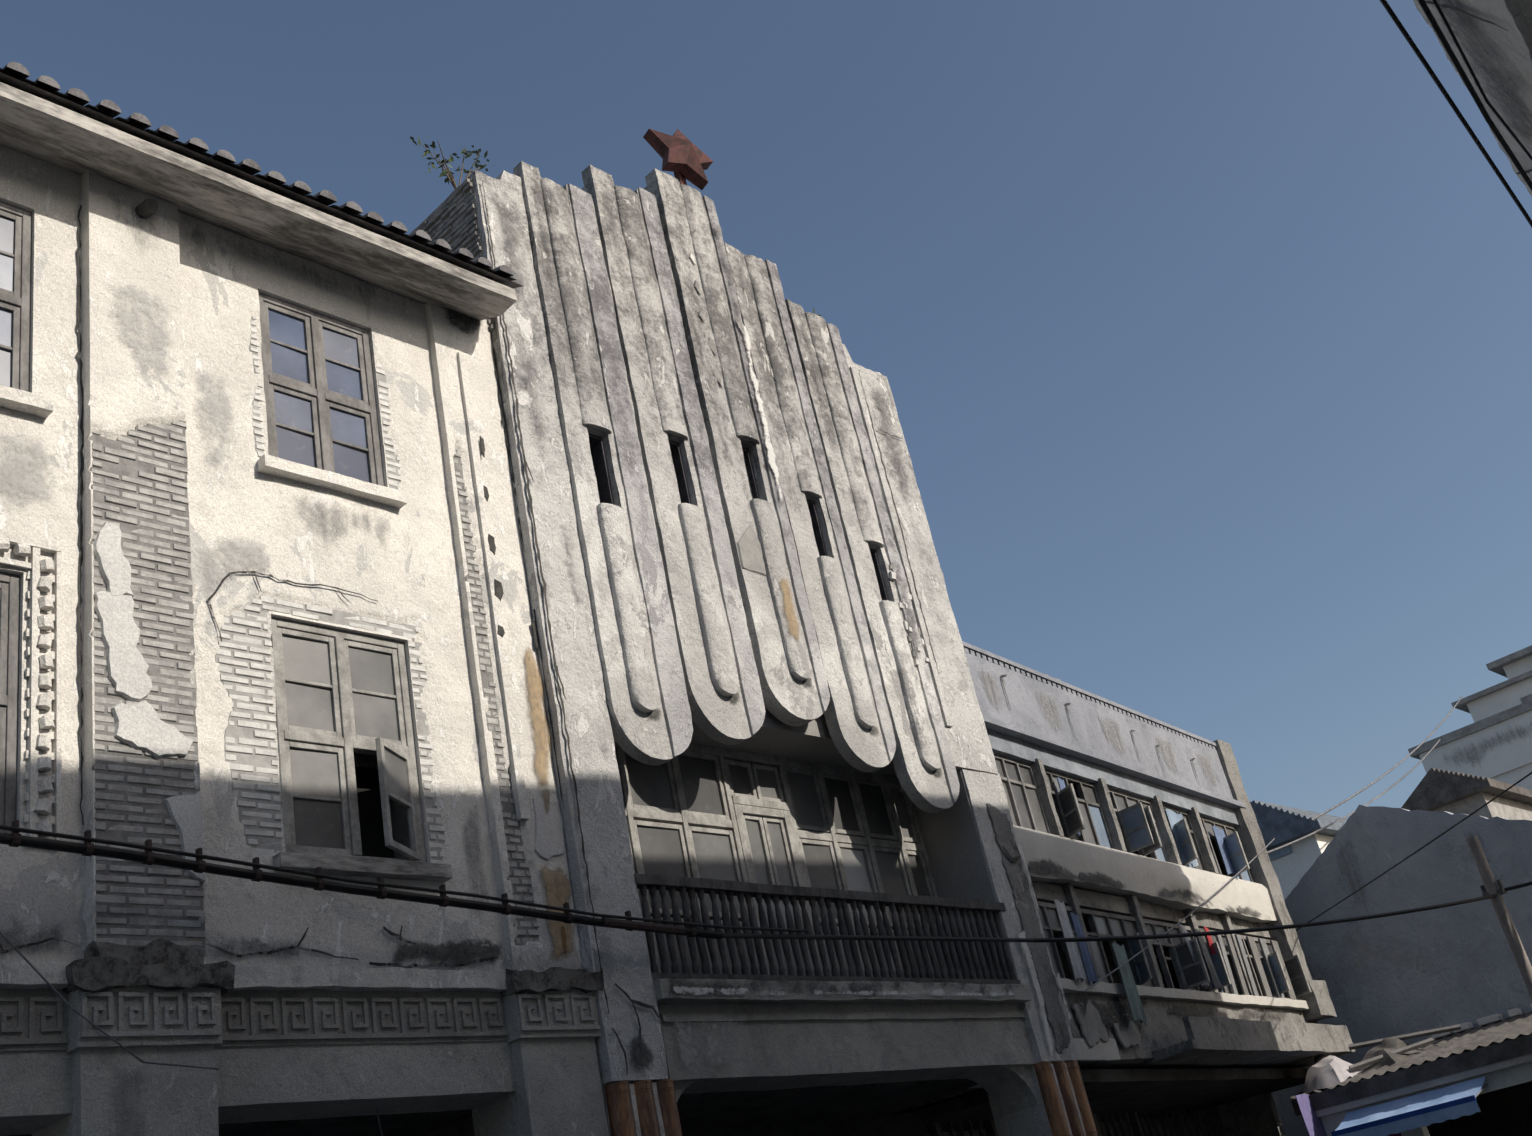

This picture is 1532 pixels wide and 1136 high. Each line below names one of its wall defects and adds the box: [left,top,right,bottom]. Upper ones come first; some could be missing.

crack [1425,0,1508,31]
crack [76,205,84,825]
flaking render [89,420,269,956]
flaking render [213,595,445,864]
flaking render [453,445,565,945]
crack [205,925,496,969]
spalling [986,803,1142,1054]